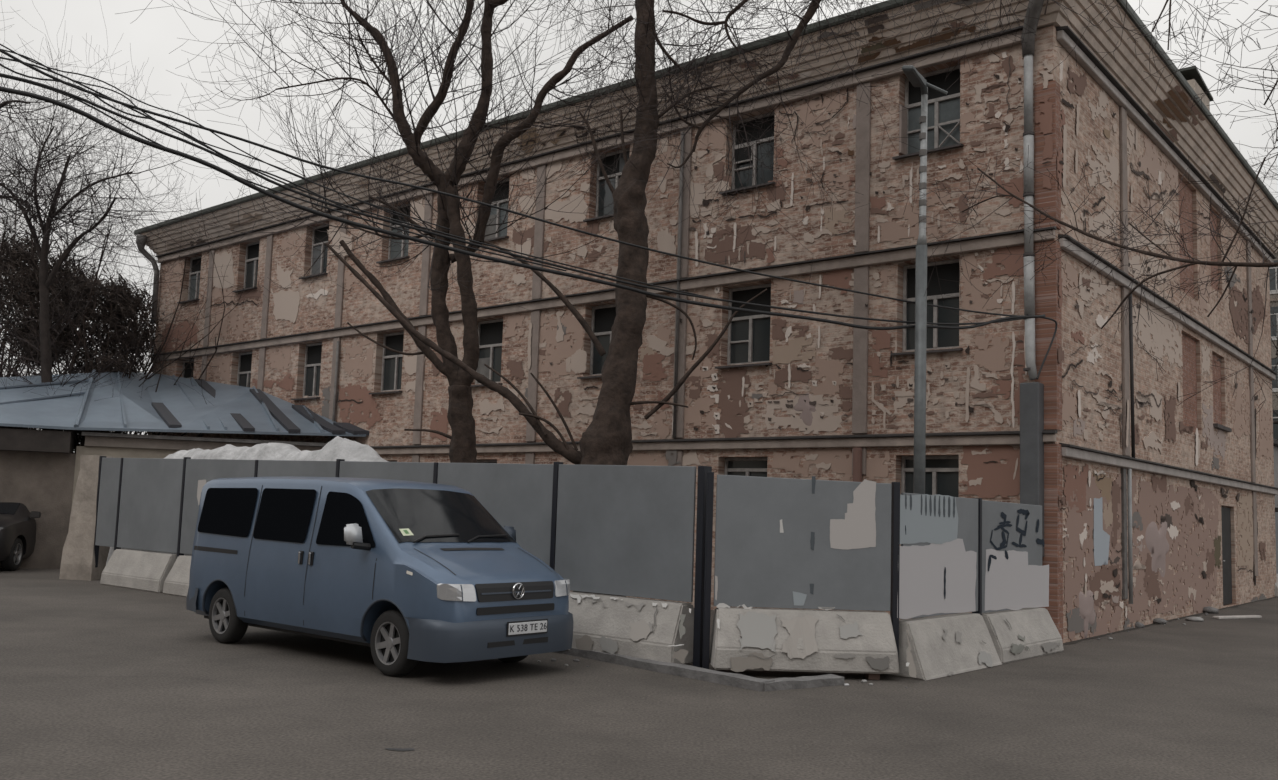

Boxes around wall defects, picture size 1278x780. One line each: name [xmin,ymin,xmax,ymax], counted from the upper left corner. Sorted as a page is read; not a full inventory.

spalling [1068,67,1087,97]
spalling [831,132,855,188]
flaking render [870,172,889,216]
spalling [765,365,853,422]
spalling [1184,480,1204,524]
spalling [1087,481,1121,610]
spalling [1143,553,1161,604]